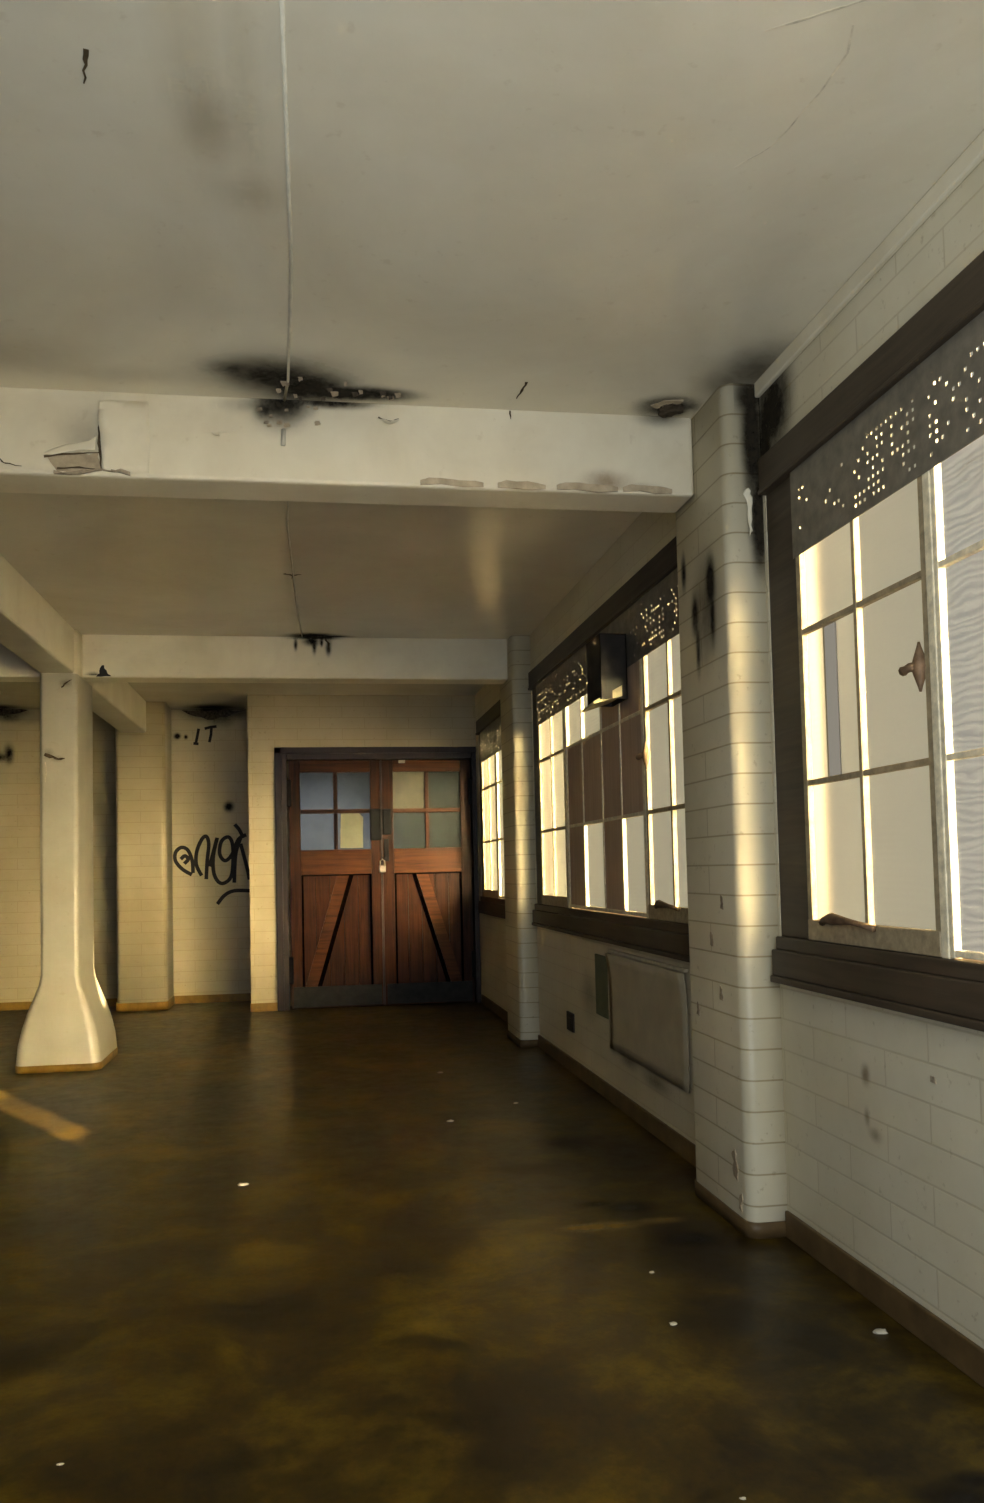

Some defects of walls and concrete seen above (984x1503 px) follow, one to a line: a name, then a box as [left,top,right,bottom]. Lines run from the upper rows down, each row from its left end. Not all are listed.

peeling [43,400,150,476]